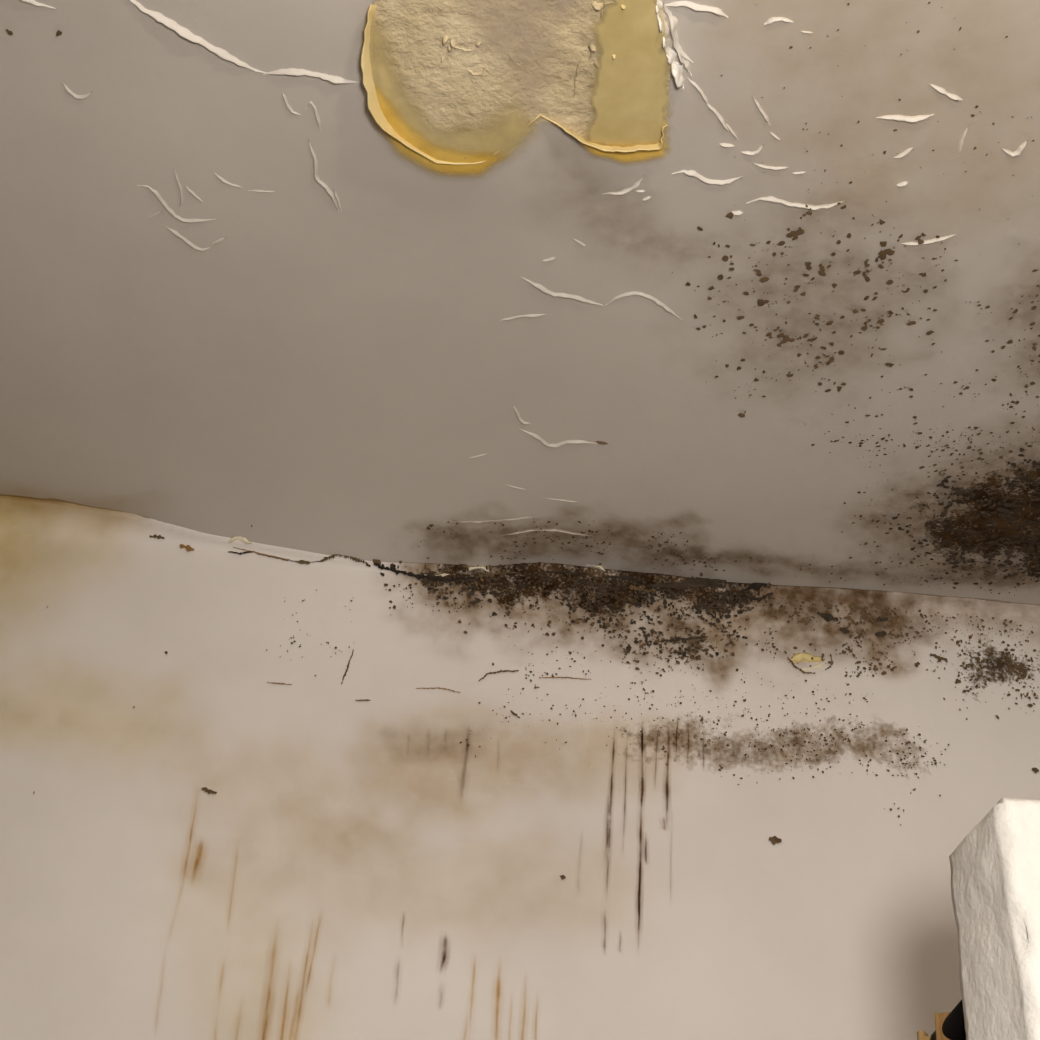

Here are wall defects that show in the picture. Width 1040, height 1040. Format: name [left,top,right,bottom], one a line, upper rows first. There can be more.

peeling [361,0,806,174]
peeling [137,169,227,251]
peeling [214,172,275,193]
peeling [604,175,652,201]
leakage [685,189,958,398]
leakage [380,322,1040,807]
leakage [638,825,646,925]